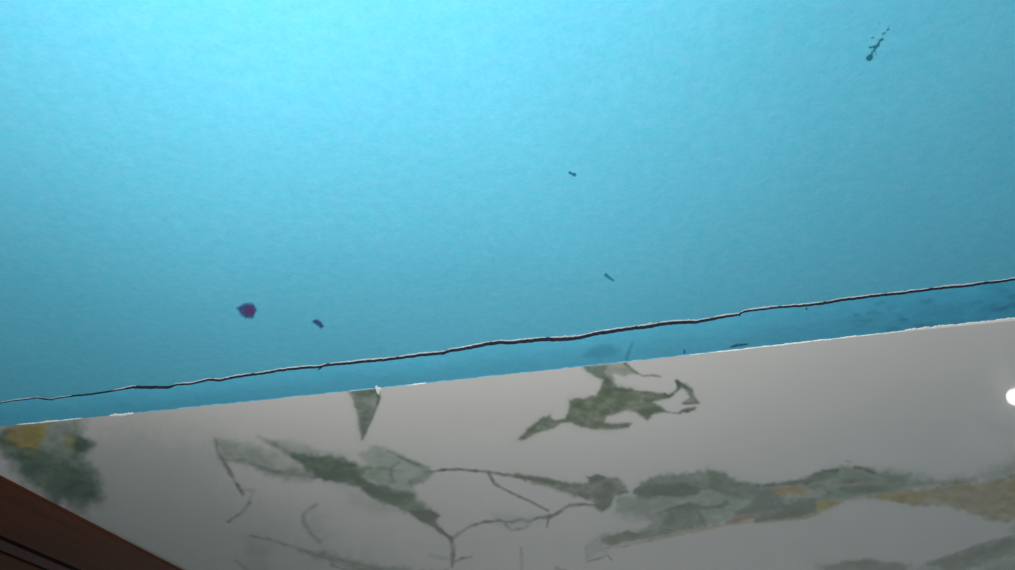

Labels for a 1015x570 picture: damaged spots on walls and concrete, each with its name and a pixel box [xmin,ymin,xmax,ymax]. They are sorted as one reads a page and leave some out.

crack [0,277,1015,404]